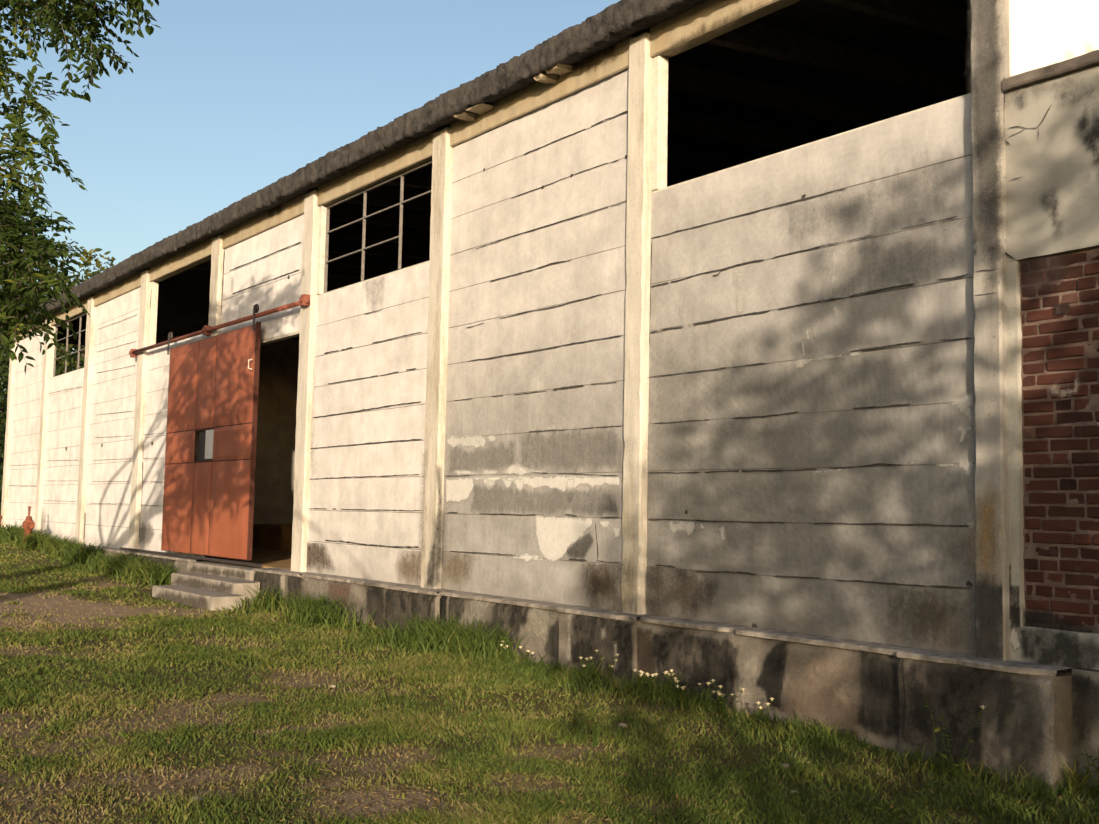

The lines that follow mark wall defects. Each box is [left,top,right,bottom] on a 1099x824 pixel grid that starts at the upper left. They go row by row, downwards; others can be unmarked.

crack [1003,77,1051,145]
water stain [956,0,1001,286]
water stain [1078,116,1099,163]
water stain [1051,380,1079,397]
peeling [447,435,496,448]
peeling [446,465,620,502]
peeling [513,515,620,562]
water stain [366,432,1099,785]